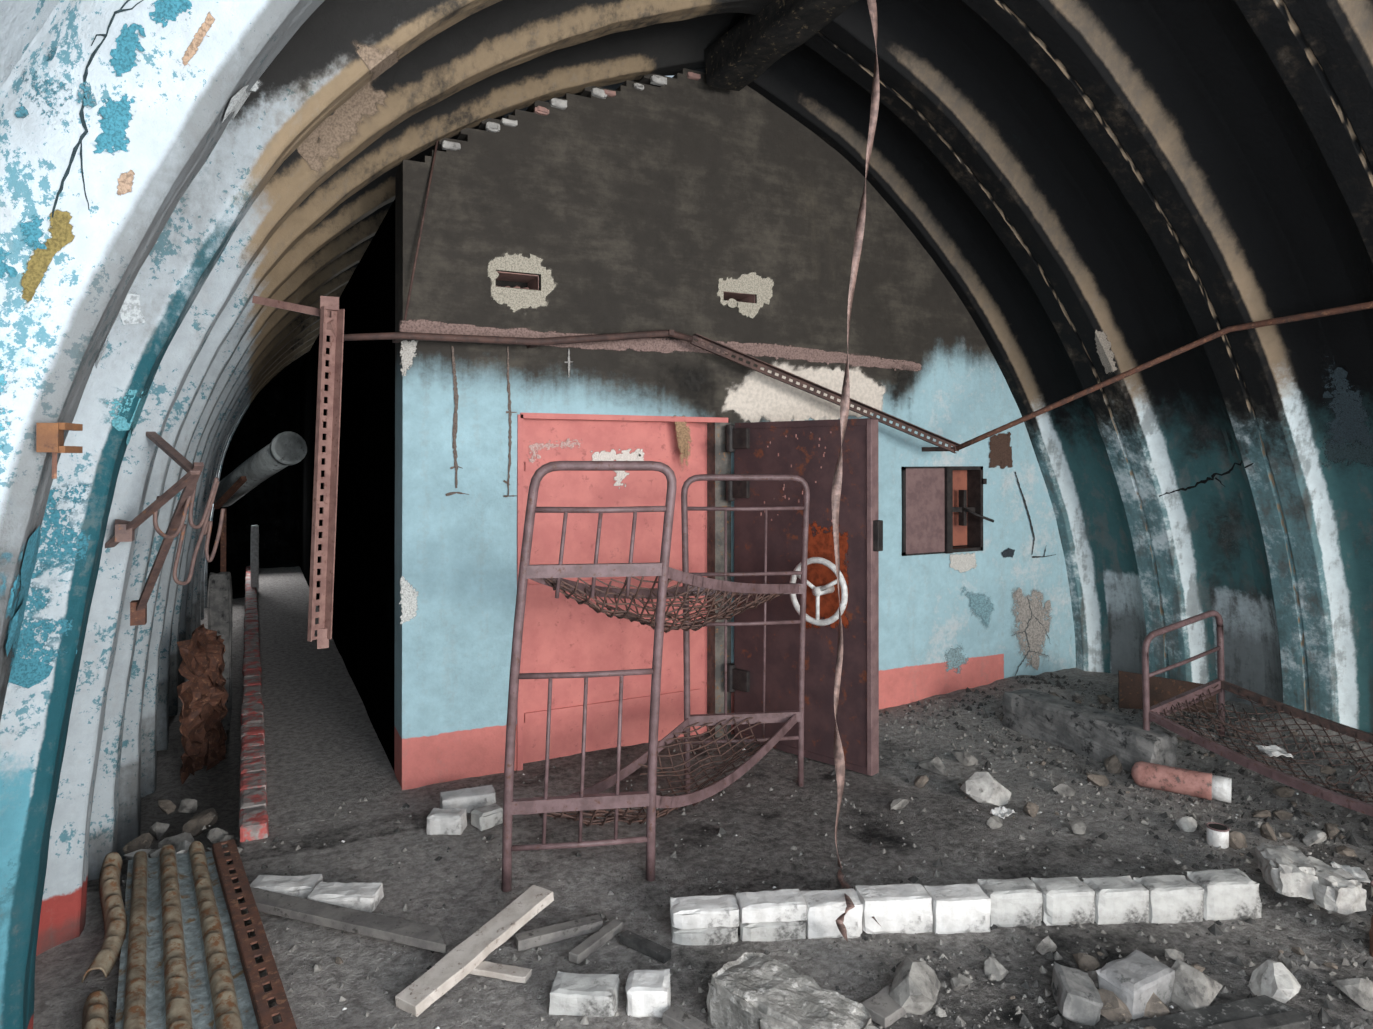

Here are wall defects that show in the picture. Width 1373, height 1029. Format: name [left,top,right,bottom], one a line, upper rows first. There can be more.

peeling [109,0,215,77]
peeling [11,47,136,155]
crack [52,0,143,218]
spalling [297,45,403,172]
spalling [117,170,135,196]
spalling [0,209,75,303]
peeling [119,293,146,325]
spalling [488,253,556,312]
spalling [717,272,774,318]
flaking render [722,344,885,521]
peeling [0,483,91,689]
rust [802,522,849,629]